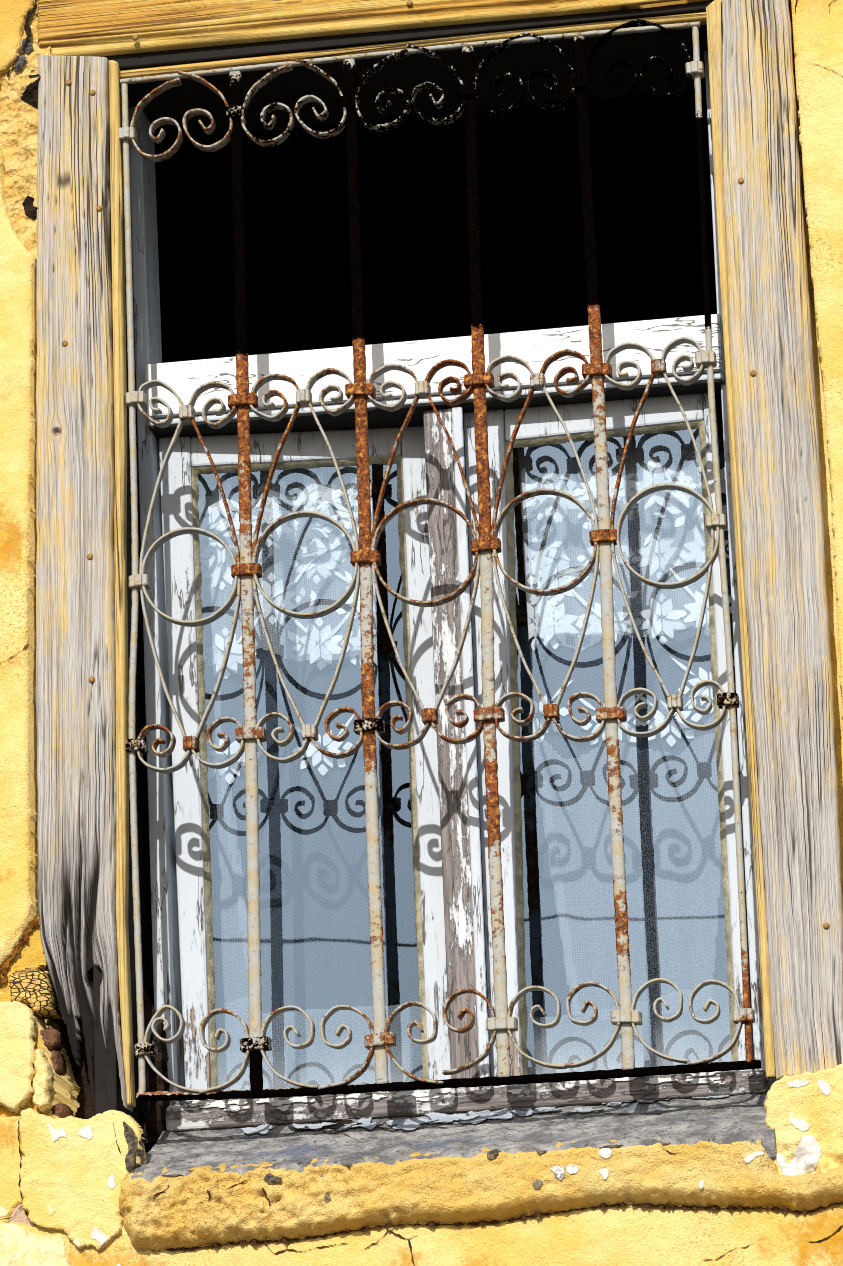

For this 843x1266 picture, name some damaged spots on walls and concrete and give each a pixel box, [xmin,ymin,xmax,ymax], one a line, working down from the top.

flaking render [0,2,51,259]
flaking render [0,917,46,1002]
spalling [0,1009,95,1142]
spalling [137,988,174,1144]
peeling [240,1123,275,1135]
peeling [189,1088,671,1131]
peeling [611,1071,729,1099]
peeling [0,1203,109,1266]